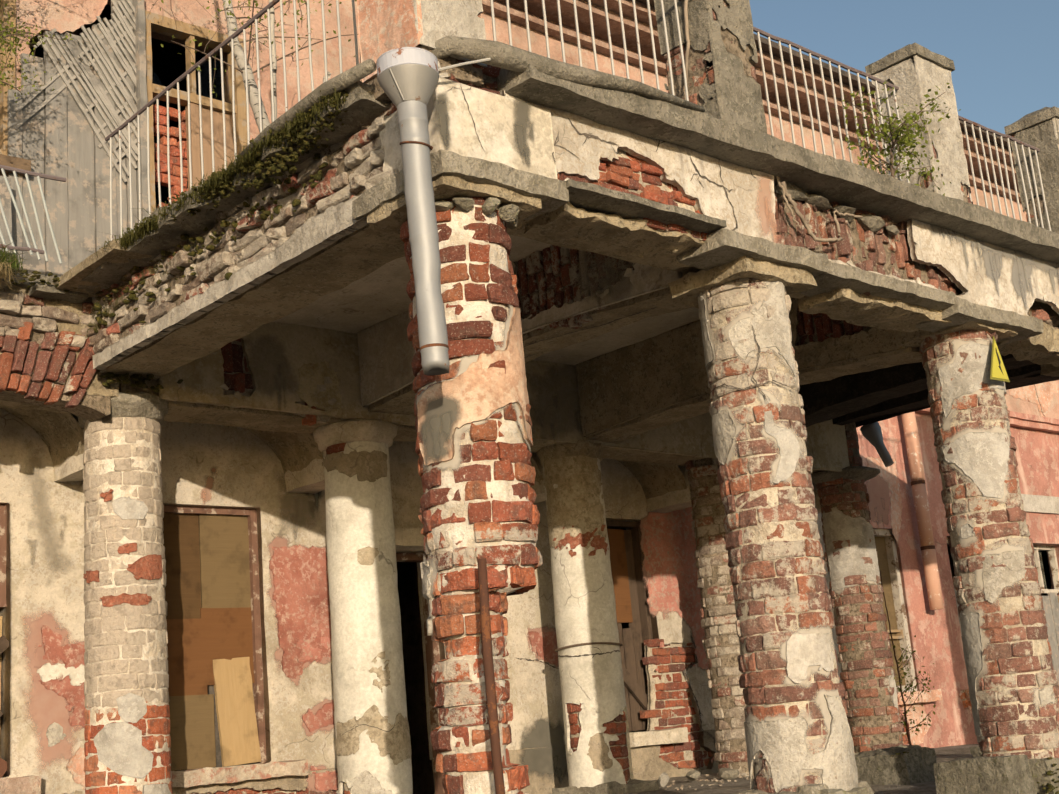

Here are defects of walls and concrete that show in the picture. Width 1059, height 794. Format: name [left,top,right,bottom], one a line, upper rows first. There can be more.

crack [447,82,484,150]
crack [552,118,624,174]
spalling [557,149,701,214]
crack [690,157,762,231]
spalling [774,186,961,295]
flaking render [759,390,804,484]
flaking render [822,506,881,594]
peeling [268,537,332,686]
peeling [639,507,714,769]
flaking render [957,519,1026,743]
spalling [567,701,635,784]
flaking render [744,626,858,793]